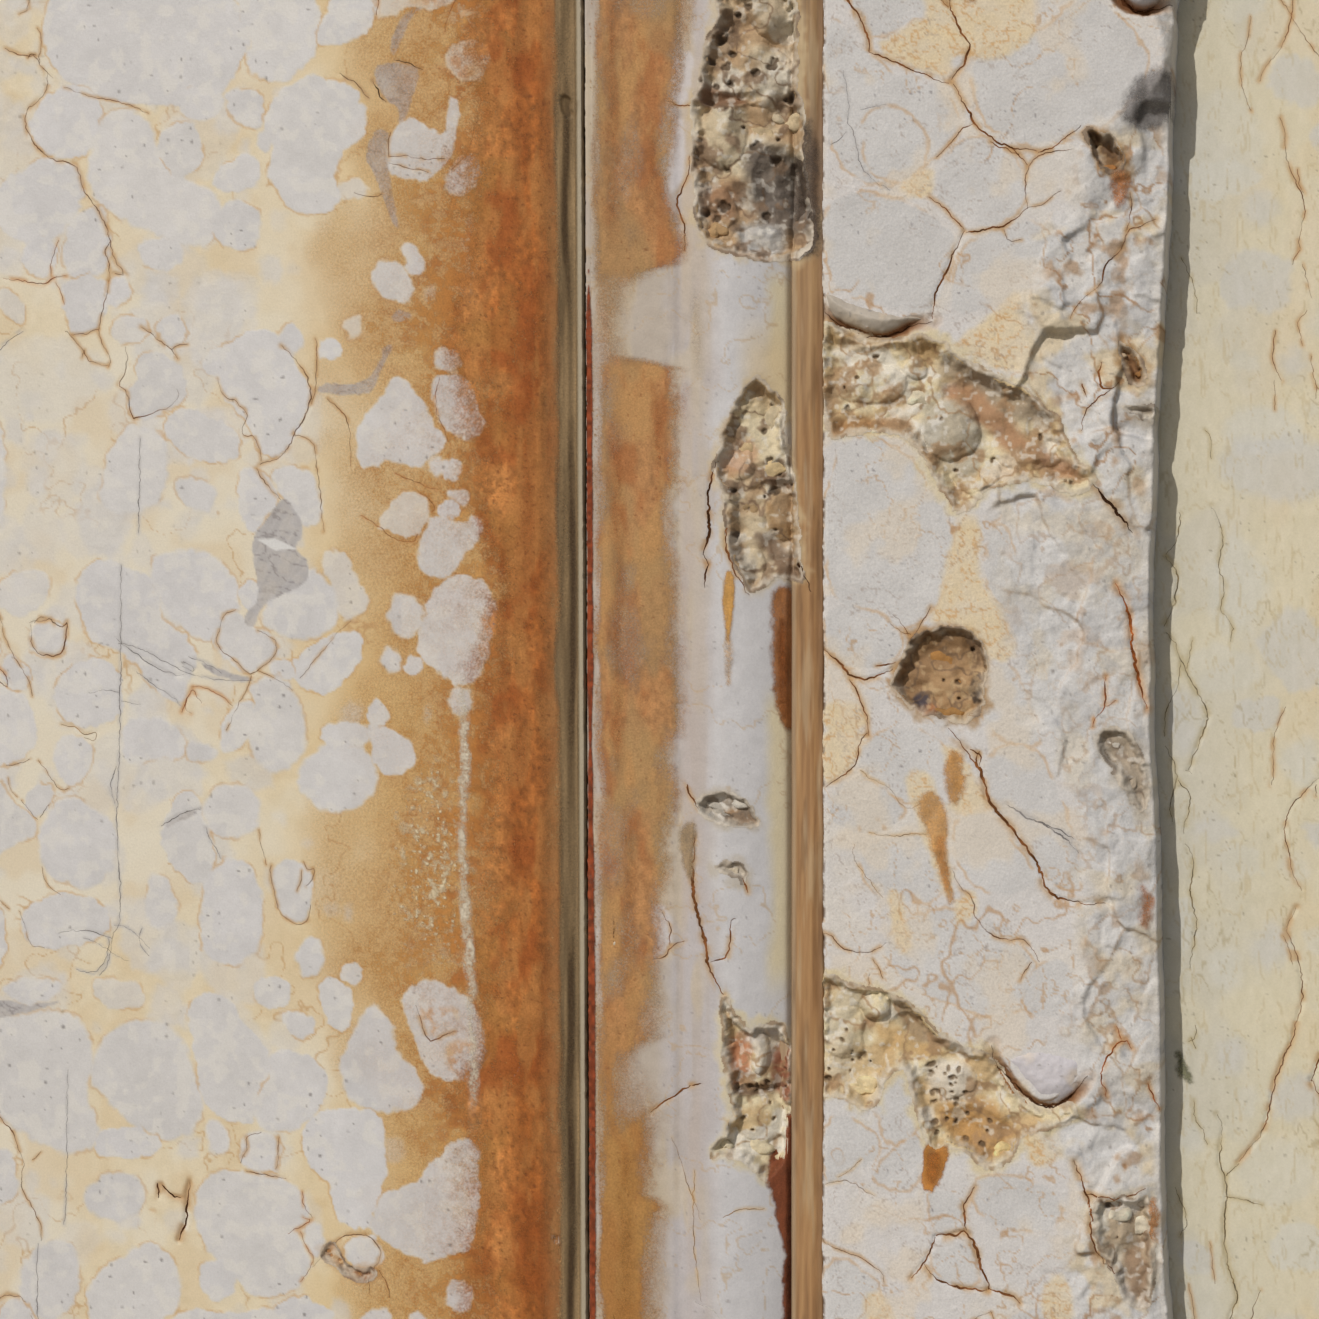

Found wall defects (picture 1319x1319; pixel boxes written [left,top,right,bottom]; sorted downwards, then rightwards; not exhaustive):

spalling [690,0,815,262]
spalling [822,321,1097,515]
corrosion [358,0,563,1319]
corrosion [586,0,687,1319]
corrosion [772,587,792,730]
crack [659,784,748,995]
crack [950,730,1097,905]
spalling [709,996,791,1183]
spalling [823,972,1079,1171]
crack [1074,707,1319,1319]
corrosion [767,1114,791,1319]
crack [823,1189,1020,1316]